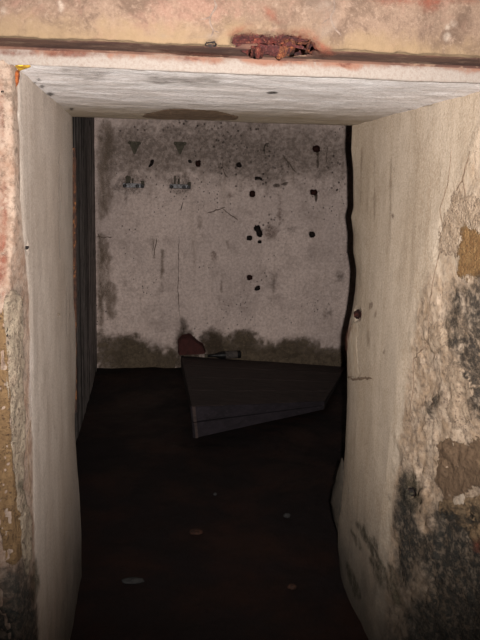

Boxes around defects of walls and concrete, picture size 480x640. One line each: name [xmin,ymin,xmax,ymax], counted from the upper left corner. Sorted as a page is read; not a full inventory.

spalling [438,191,480,281]
leakage [97,322,347,368]
spalling [427,311,465,357]
spalling [0,290,33,576]
spalling [445,361,477,428]
spalling [434,436,480,544]
leakage [393,474,480,640]